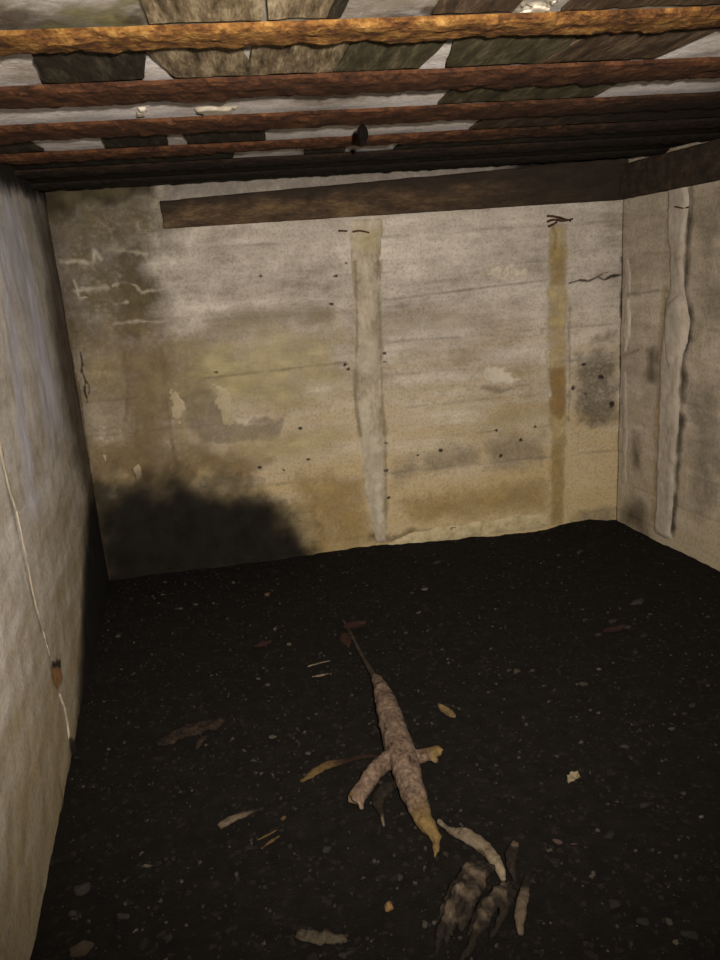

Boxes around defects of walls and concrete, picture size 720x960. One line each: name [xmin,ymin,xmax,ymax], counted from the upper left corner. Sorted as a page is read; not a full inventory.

crack [570,257,623,318]
peeling [168,371,274,441]
corrosion [546,225,570,524]